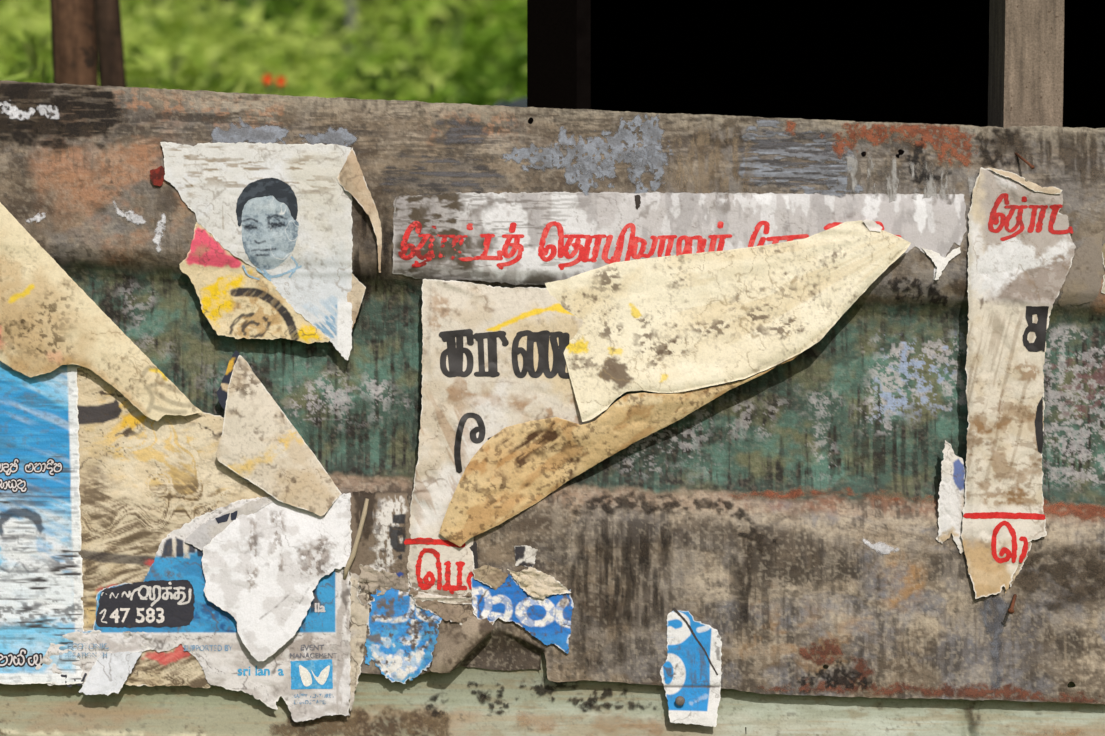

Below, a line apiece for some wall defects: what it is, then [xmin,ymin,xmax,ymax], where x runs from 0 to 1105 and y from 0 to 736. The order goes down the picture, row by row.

peeling [0,101,59,120]
peeling [381,119,504,195]
peeling [503,114,673,195]
rust [821,123,972,166]
damp [574,492,776,551]
rust [751,489,821,498]
rust [1043,501,1105,519]
damp [571,535,663,622]
damp [740,574,751,615]
damp [1019,548,1105,611]
damp [982,597,1008,688]